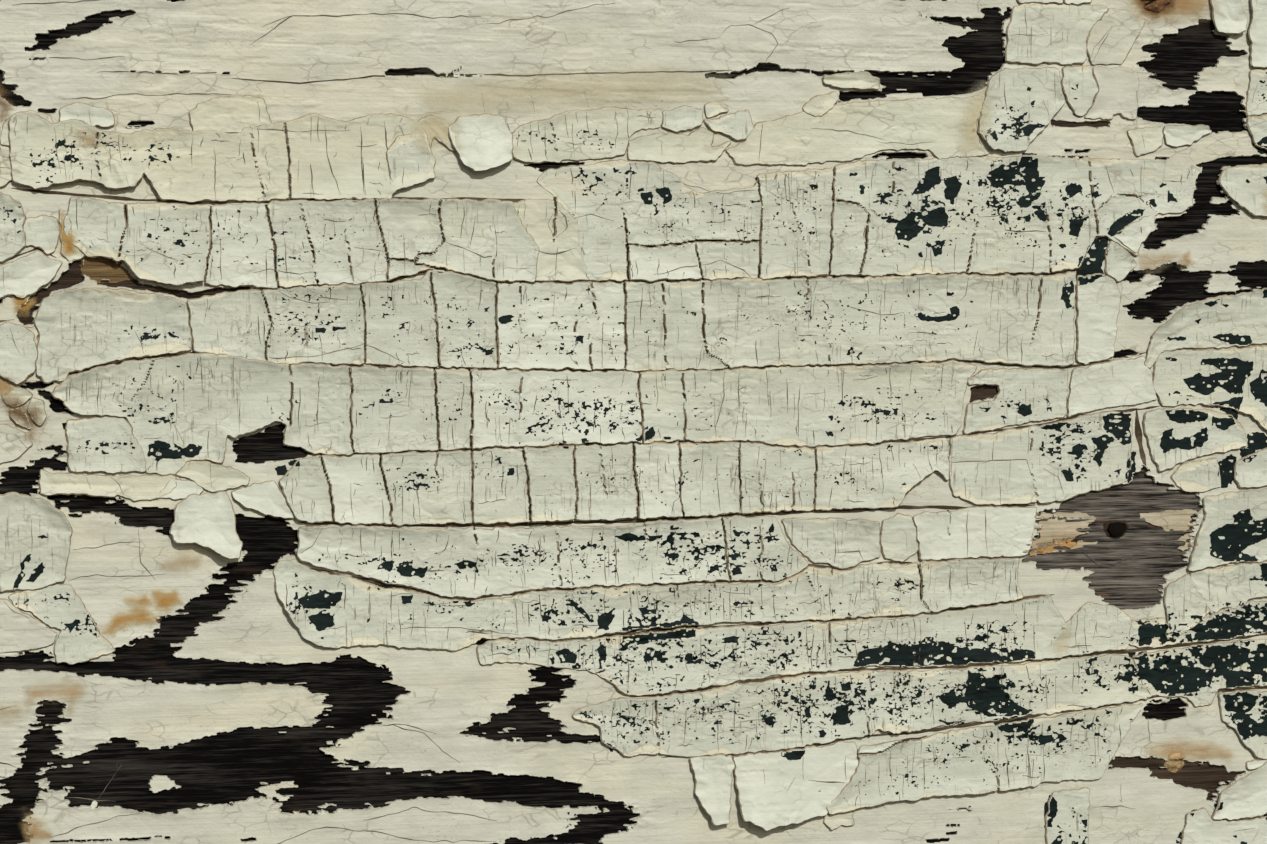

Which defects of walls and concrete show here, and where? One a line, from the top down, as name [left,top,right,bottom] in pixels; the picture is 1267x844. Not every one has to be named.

peeling [25,10,135,60]
peeling [705,8,1012,117]
peeling [1005,0,1145,66]
rust [1136,0,1205,17]
peeling [1137,0,1247,90]
crack [13,188,524,205]
peeling [0,65,1267,527]
crack [318,406,1159,470]
crack [298,504,1033,527]
crack [310,561,912,601]
peeling [0,408,1267,844]
crack [629,633,1267,697]